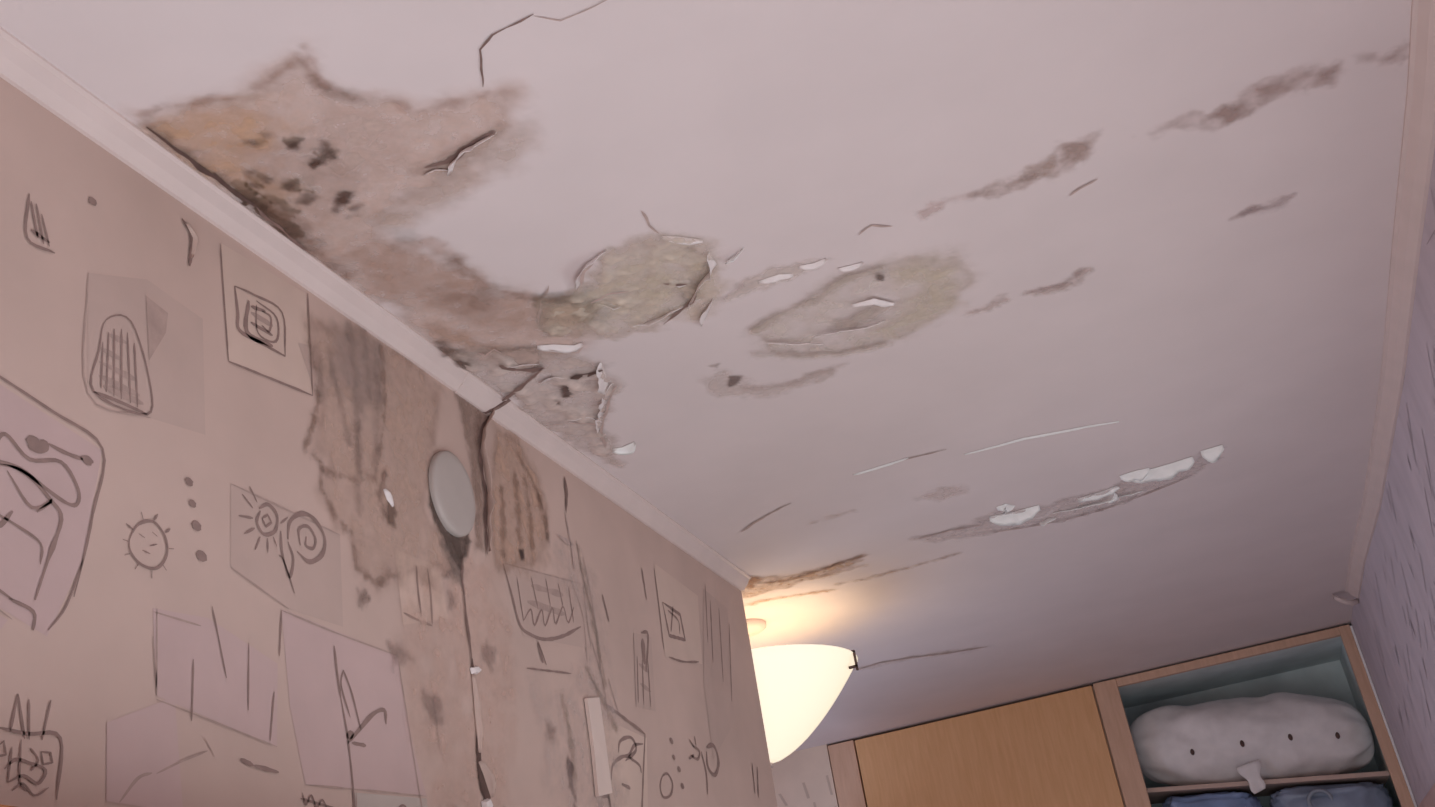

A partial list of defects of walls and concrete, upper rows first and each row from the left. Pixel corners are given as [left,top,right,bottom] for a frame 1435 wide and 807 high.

crack [479,0,607,87]
damp [173,86,582,360]
peeling [423,131,497,176]
flaking render [439,211,864,463]
damp [319,451,414,529]
damp [460,398,547,563]
peeling [919,445,1224,540]
crack [461,556,496,807]